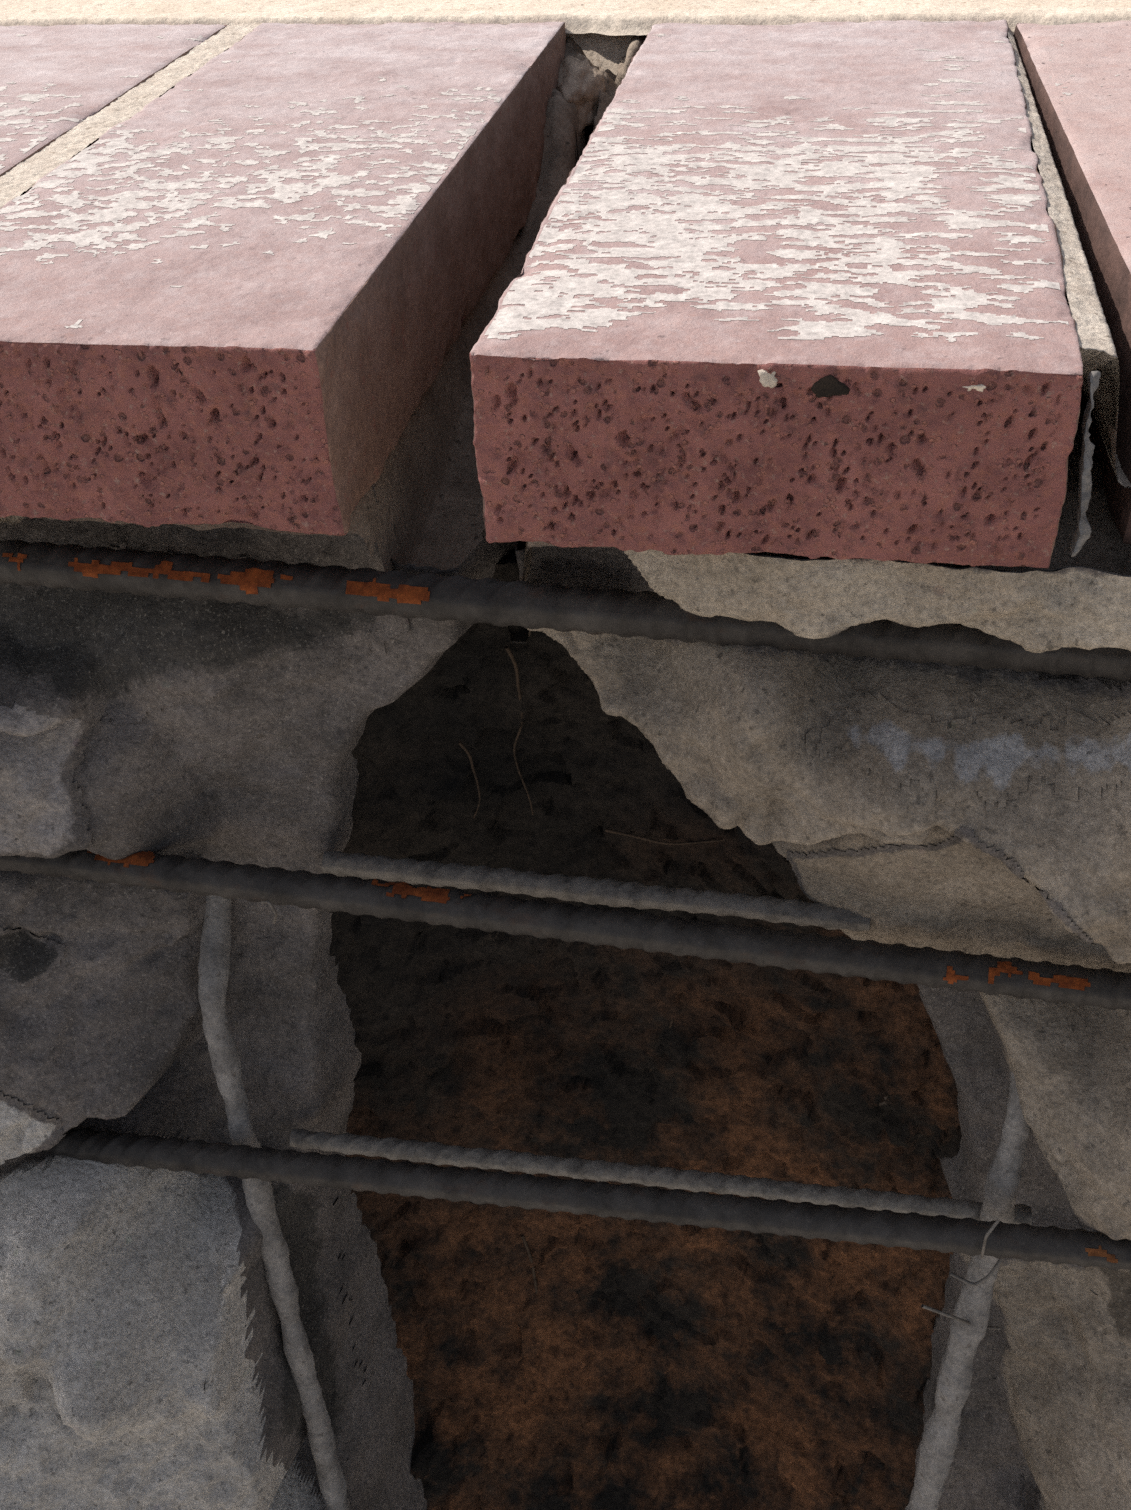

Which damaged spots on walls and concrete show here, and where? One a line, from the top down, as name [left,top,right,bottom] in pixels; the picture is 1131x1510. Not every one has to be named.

crack [575,125,594,164]
crack [479,530,526,562]
corrosion [68,558,293,594]
corrosion [345,578,430,605]
crack [508,628,529,642]
corrosion [87,850,155,868]
corrosion [371,879,472,904]
corrosion [943,966,969,984]
corrosion [988,961,1091,991]
spalling [0,516,1131,1510]